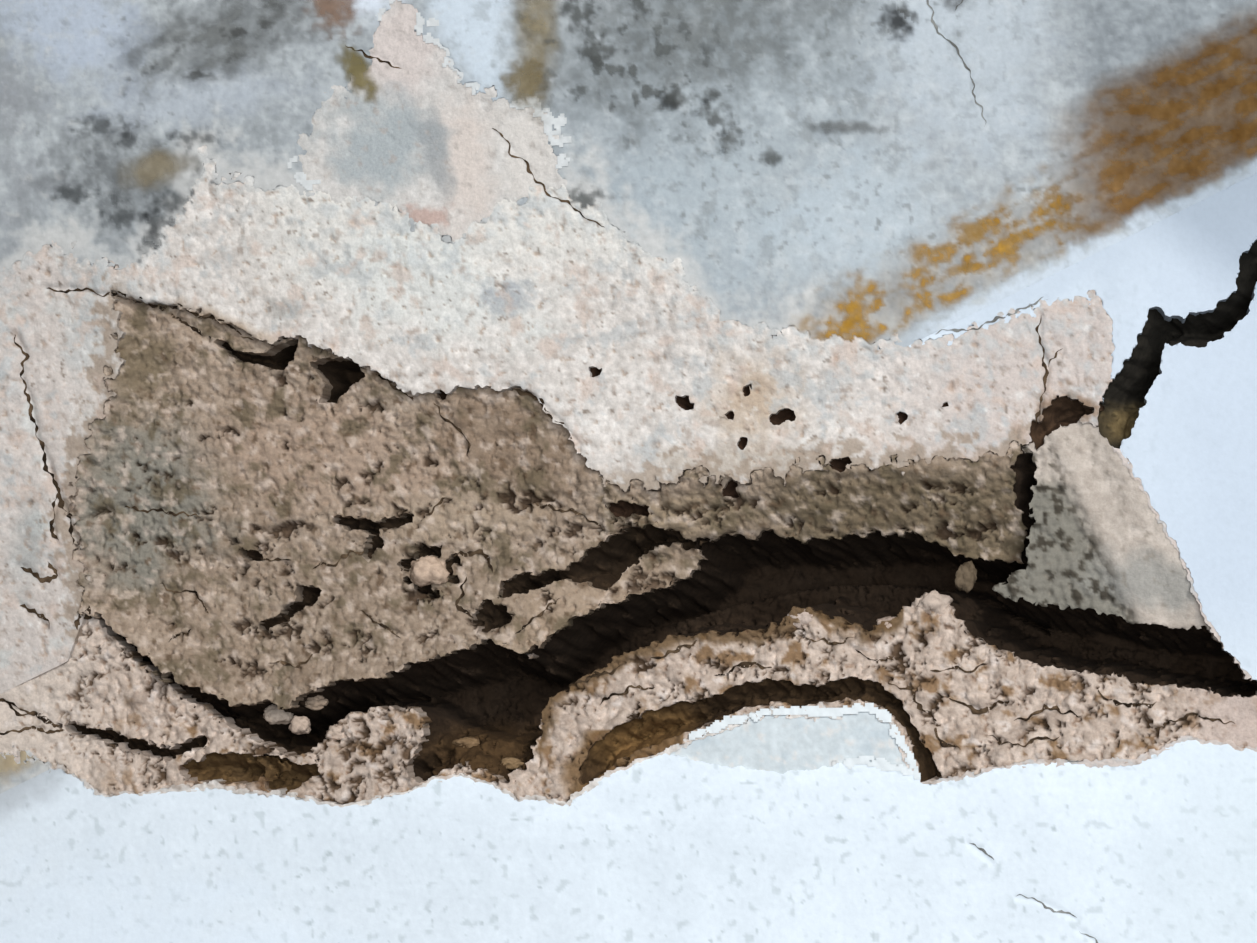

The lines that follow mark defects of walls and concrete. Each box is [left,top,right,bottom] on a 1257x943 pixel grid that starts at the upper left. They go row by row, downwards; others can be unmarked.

leakage [128,0,292,76]
leakage [315,0,353,25]
leakage [342,49,376,99]
peeling [287,0,572,242]
leakage [502,0,784,106]
leakage [821,122,870,132]
corrosion [1086,20,1257,223]
leakage [572,192,599,208]
corrosion [905,194,1089,322]
corrosion [818,282,887,342]
spalling [0,145,1257,807]
crack [0,240,1257,794]